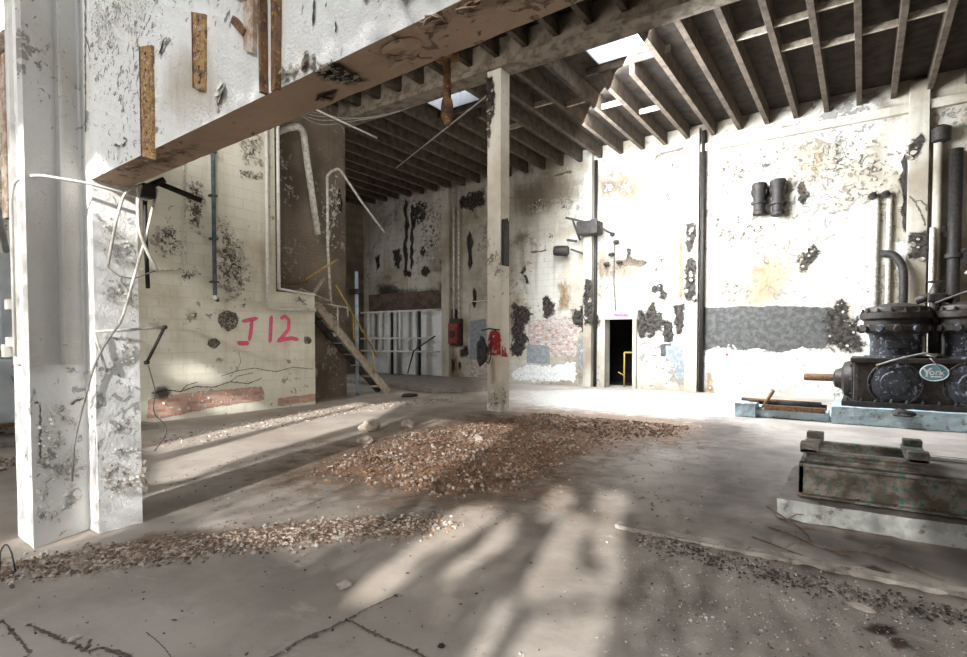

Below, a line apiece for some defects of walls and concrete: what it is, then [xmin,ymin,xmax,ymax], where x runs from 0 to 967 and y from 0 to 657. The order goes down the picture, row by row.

peeling [417,13,449,32]
peeling [455,0,497,17]
flaking render [687,136,925,394]
spalling [147,386,264,418]
crack [152,354,310,394]
spalling [470,319,487,378]
spalling [487,316,587,408]
spalling [660,322,684,380]
peeling [35,404,148,523]
crack [0,618,134,657]
crack [270,594,425,657]